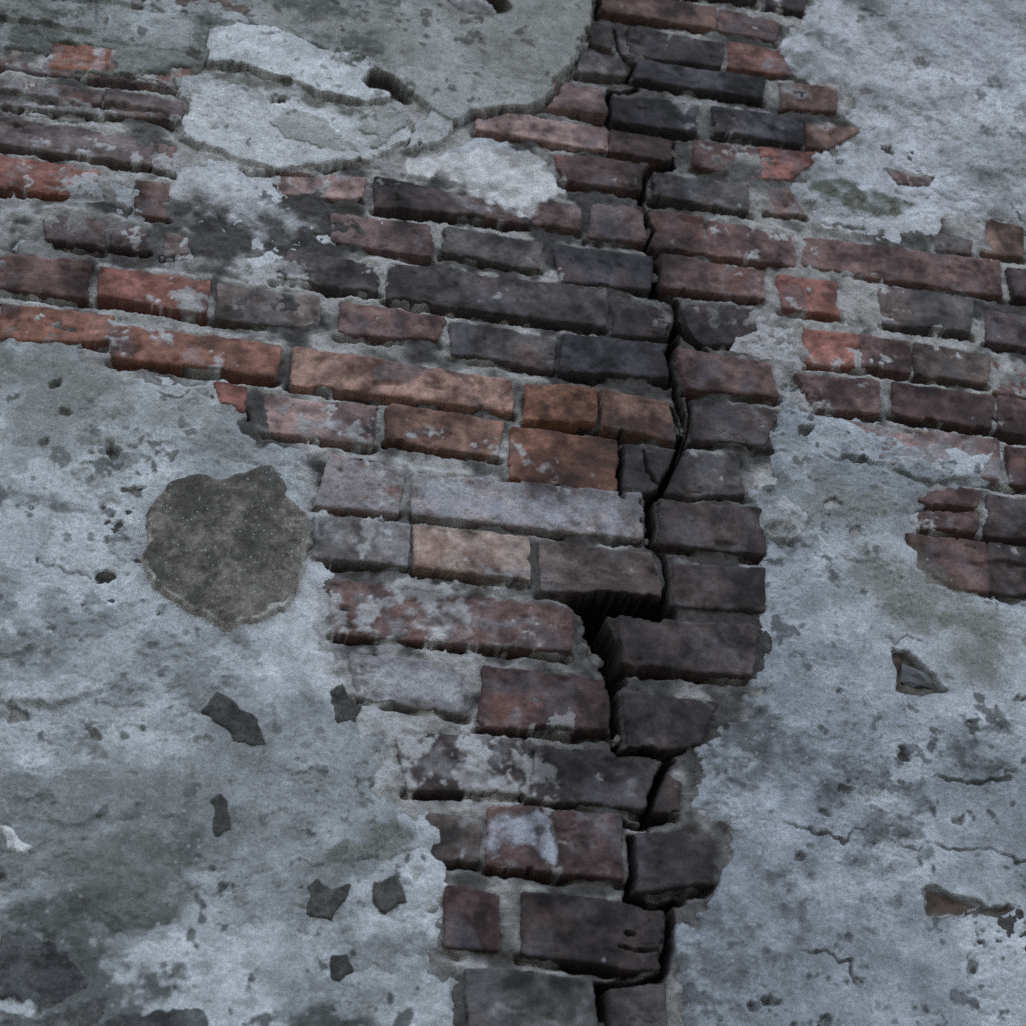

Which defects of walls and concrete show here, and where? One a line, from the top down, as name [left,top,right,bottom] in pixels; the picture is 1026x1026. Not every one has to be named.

flaking render [172,22,453,174]
crack [558,0,709,1026]
peeling [140,465,313,632]
spalling [201,692,266,746]
spalling [330,684,362,723]
spalling [0,825,32,855]
spalling [210,794,231,837]
spalling [304,815,422,921]
crack [783,820,1026,866]
spalling [0,934,209,1026]
spalling [329,954,354,982]